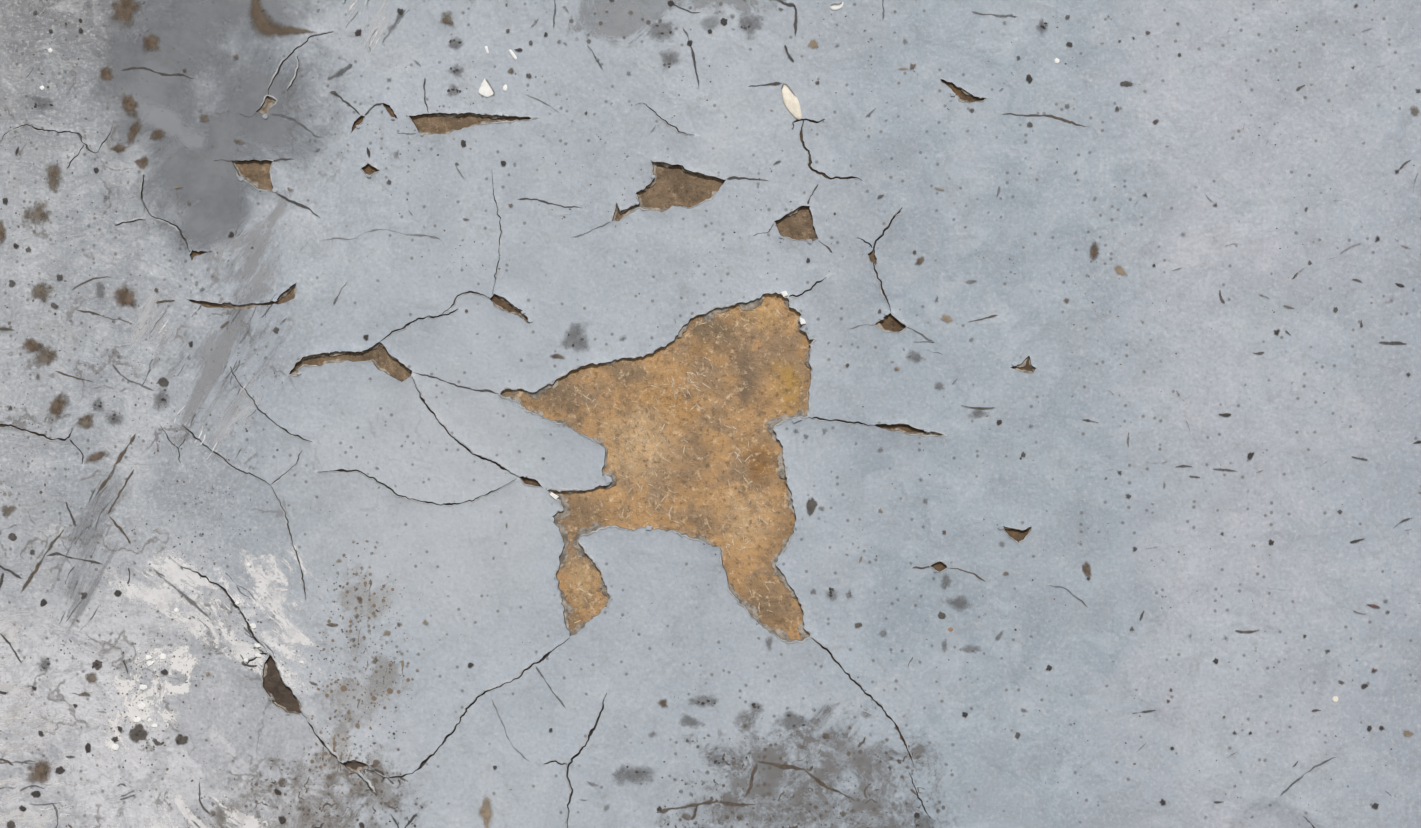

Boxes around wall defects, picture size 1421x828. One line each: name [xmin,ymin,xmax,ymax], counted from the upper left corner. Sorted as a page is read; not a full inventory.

peeling [383,50,539,147]
leakage [103,0,297,460]
peeling [611,159,725,221]
peeling [774,205,818,262]
crack [791,118,863,204]
peeling [289,335,412,382]
crack [161,366,517,600]
peeling [498,278,826,644]
crack [181,566,267,667]
spalling [261,653,301,715]
crack [300,638,607,828]
crack [812,637,929,816]